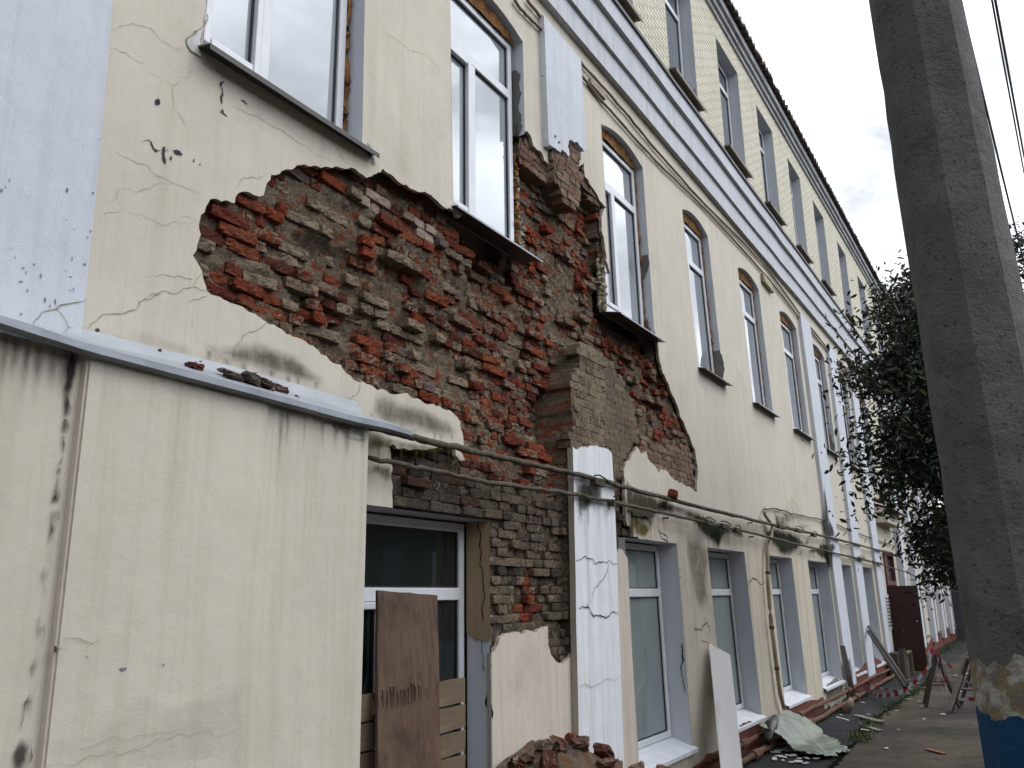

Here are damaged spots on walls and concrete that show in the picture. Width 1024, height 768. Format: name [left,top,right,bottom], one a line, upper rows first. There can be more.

flaking render [144,140,201,165]
crack [33,274,208,332]
water stain [62,352,76,449]
spalling [193,123,695,669]
water stain [627,483,742,600]
water stain [766,516,803,554]
water stain [814,491,835,567]
crack [577,555,619,619]
crack [680,622,711,693]
water stain [14,743,33,768]